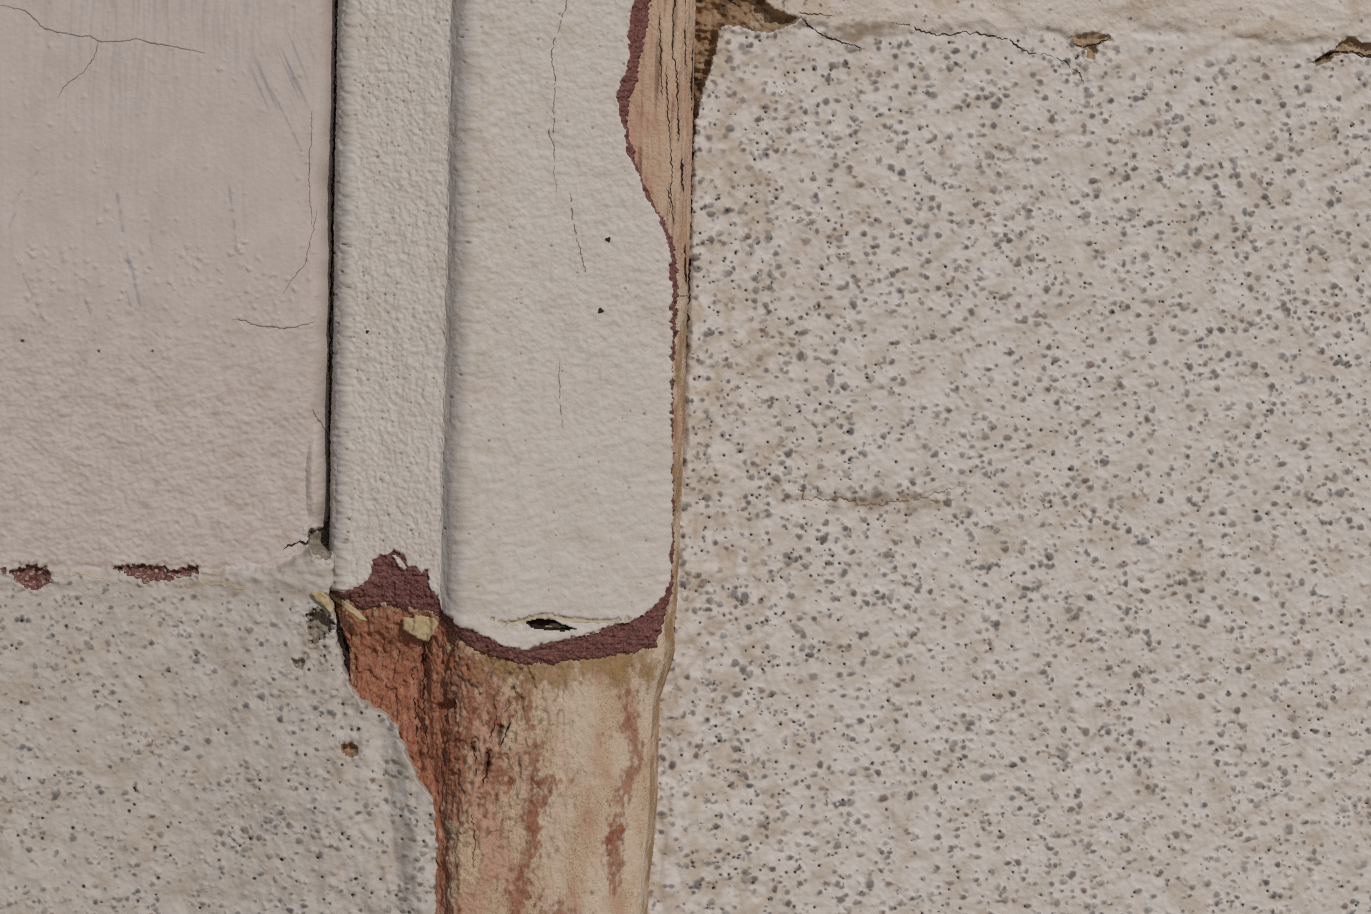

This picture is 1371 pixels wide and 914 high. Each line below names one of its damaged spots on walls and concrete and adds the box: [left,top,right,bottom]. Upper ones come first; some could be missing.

crack [799,11,864,49]
crack [4,5,204,97]
spalling [1071,32,1111,60]
spalling [1312,37,1371,66]
spalling [306,0,800,665]
spalling [0,563,52,590]
spalling [113,564,199,584]
spalling [292,657,305,670]
spalling [341,743,358,757]